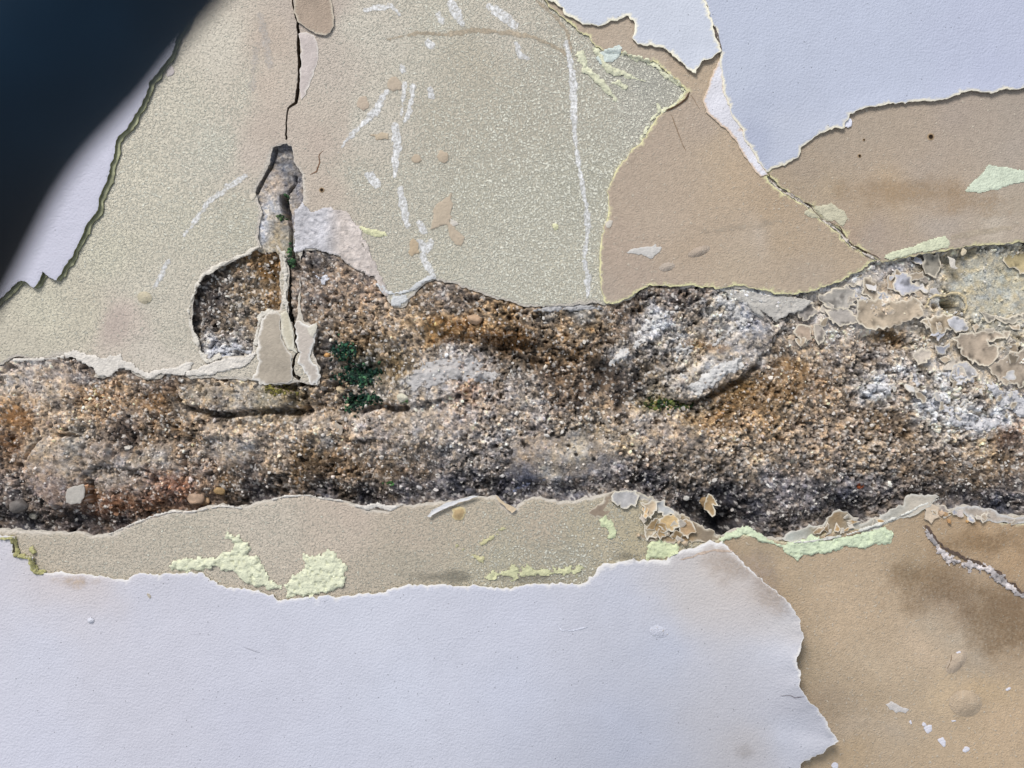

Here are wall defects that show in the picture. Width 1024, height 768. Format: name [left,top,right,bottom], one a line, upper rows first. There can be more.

crack [285,0,301,140]
spalling [187,144,303,363]
peeling [545,0,1024,304]
crack [767,172,881,263]
crack [292,322,300,380]
spalling [0,202,1024,768]
crack [923,525,1024,598]